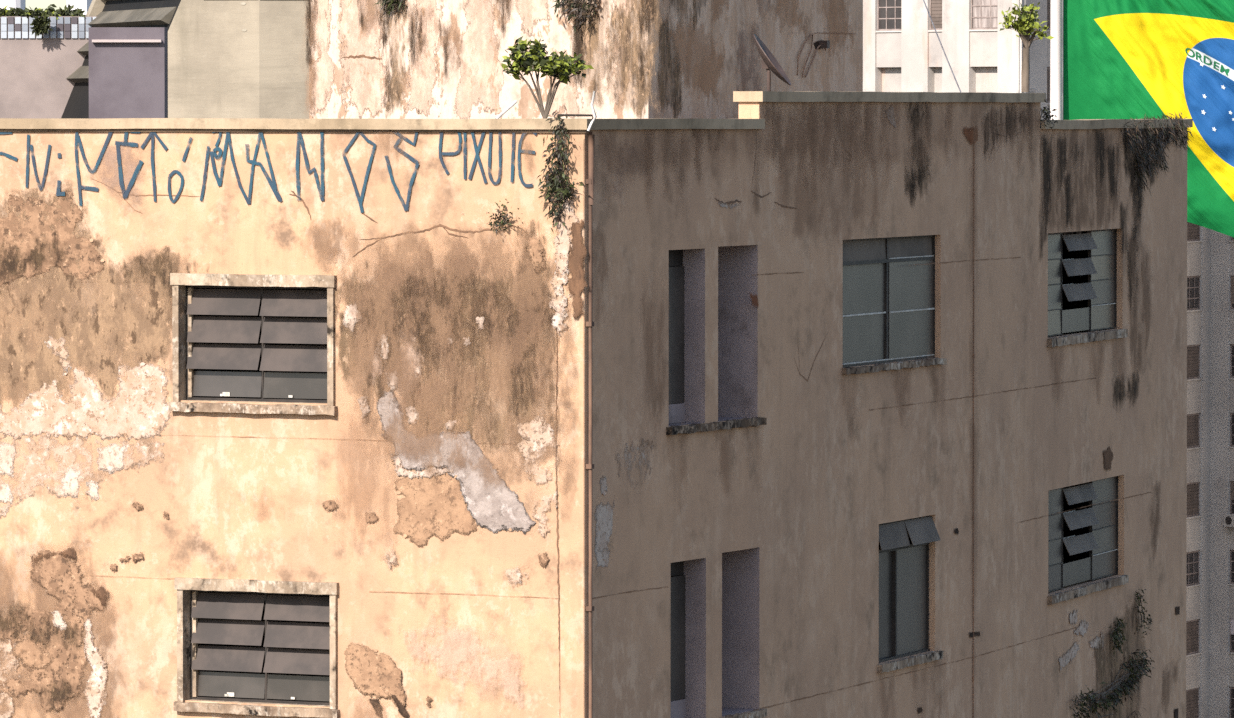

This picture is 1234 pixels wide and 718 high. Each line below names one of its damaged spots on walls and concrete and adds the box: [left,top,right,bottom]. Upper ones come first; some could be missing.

damp [357,0,423,113]
damp [573,0,729,118]
flaking render [0,335,171,518]
damp [0,189,190,408]
damp [315,228,341,260]
crack [354,213,528,256]
spalling [343,269,560,548]
damp [335,224,569,481]
peeling [518,194,579,336]
damp [984,102,1168,404]
peeling [0,548,109,718]
spalling [344,642,409,718]